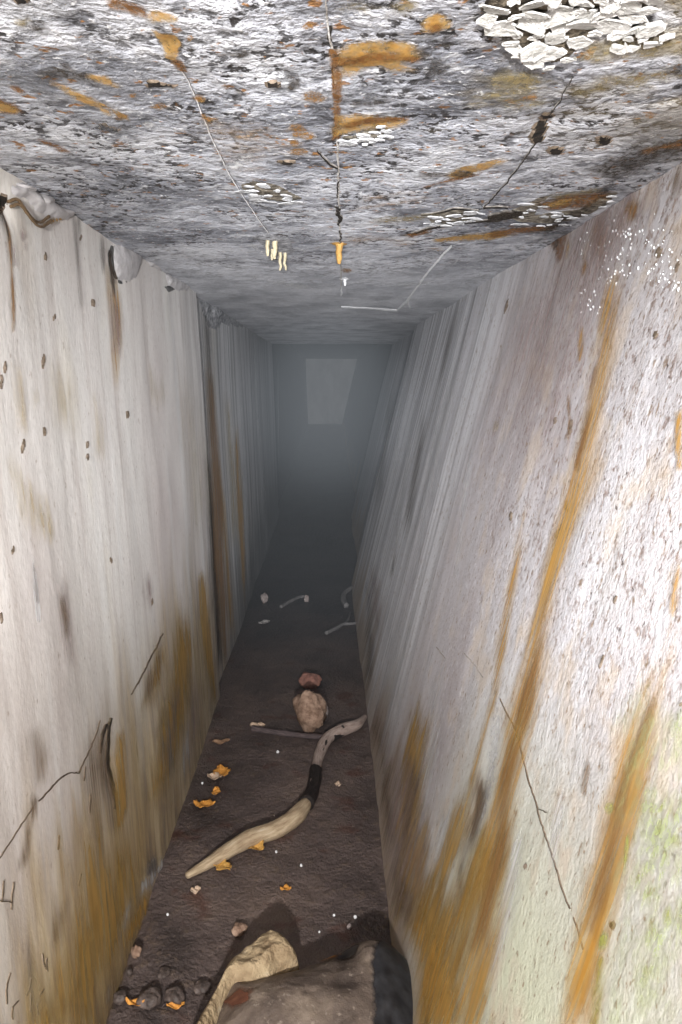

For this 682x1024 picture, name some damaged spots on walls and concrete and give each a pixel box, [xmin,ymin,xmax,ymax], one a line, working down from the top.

corrosion [108,0,193,72]
spalling [234,181,304,205]
corrosion [304,42,419,140]
spalling [423,210,485,227]
crack [410,77,573,235]
spalling [510,193,617,227]
peeling [476,0,675,72]
water stain [512,141,682,387]
corrosion [453,284,615,1024]
crack [0,720,101,910]
crack [500,698,584,950]
corrosion [566,705,653,1021]